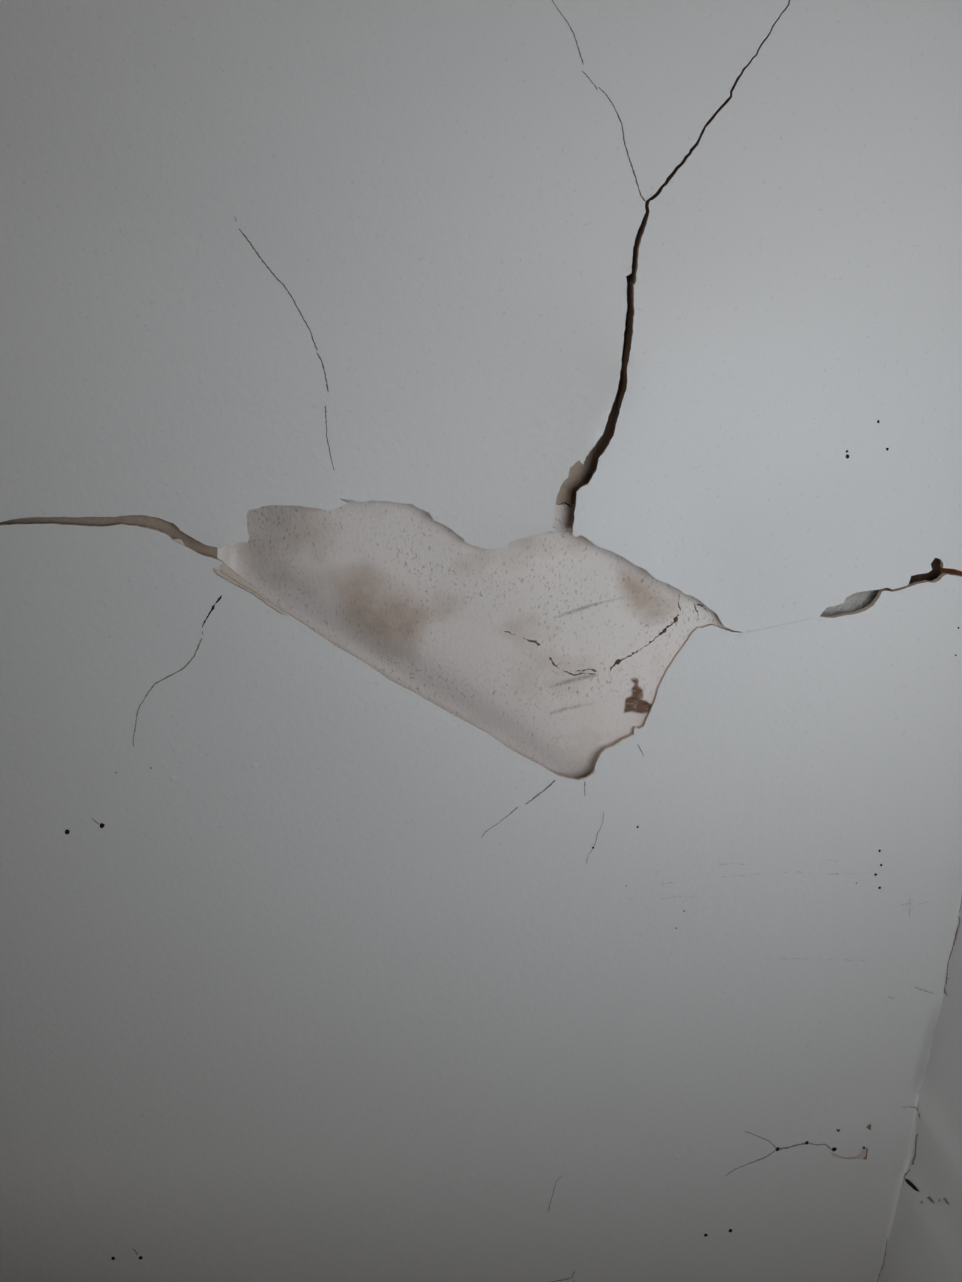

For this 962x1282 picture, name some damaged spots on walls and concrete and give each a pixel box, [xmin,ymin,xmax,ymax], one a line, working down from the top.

crack [549,0,790,532]
crack [235,218,335,471]
crack [0,515,222,561]
crack [133,595,222,747]
flaking render [193,492,743,781]
crack [820,558,962,618]
crack [724,1131,868,1177]